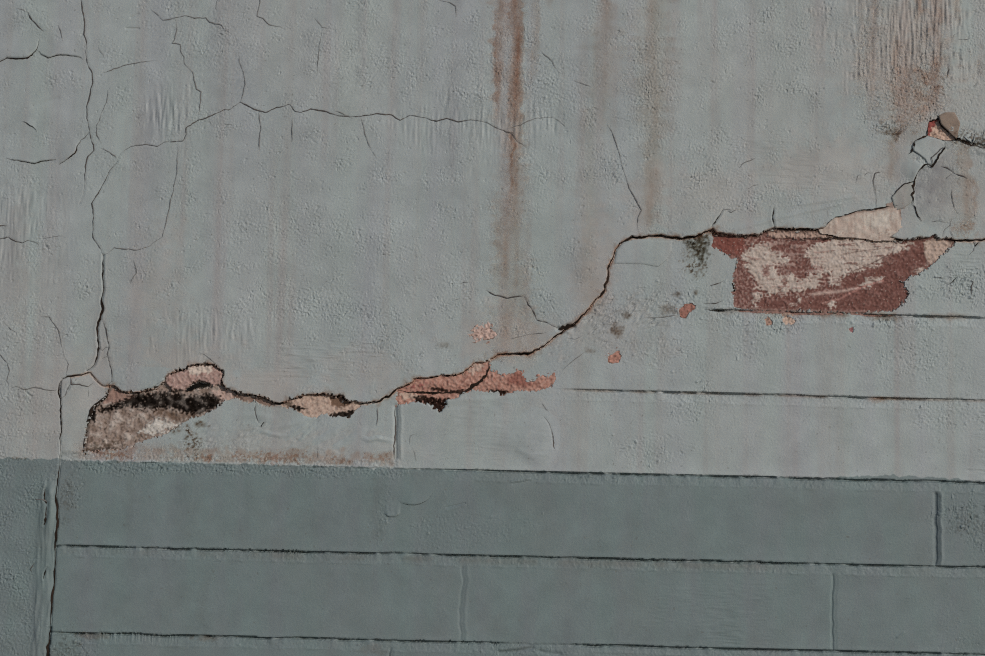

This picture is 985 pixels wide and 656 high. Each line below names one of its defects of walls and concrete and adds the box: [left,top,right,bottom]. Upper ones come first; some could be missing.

flaking render [83,364,368,455]
crack [0,0,567,656]
flaking render [395,361,556,413]
crack [487,123,829,369]
flaking render [712,112,984,326]
crack [932,166,985,253]